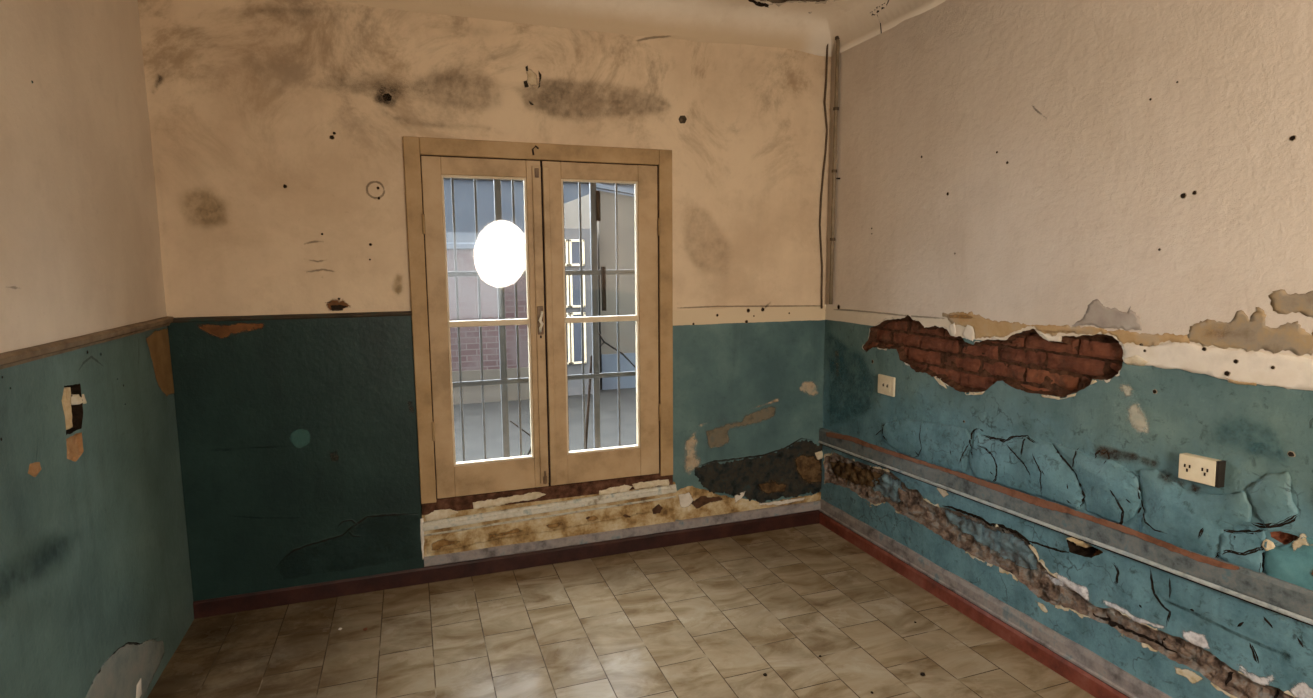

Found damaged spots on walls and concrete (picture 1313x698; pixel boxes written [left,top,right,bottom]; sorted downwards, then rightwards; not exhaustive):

flaking render [862,289,1313,400]
flaking render [64,384,87,462]
peeling [28,462,41,477]
crack [913,422,1300,573]
flaking render [425,452,1313,698]
crack [1093,562,1194,653]
peeling [85,639,165,698]